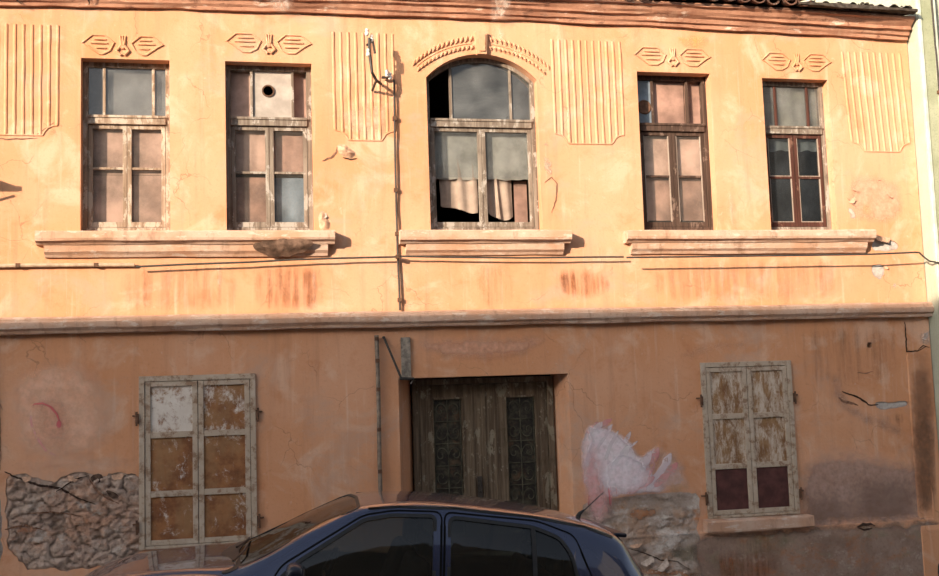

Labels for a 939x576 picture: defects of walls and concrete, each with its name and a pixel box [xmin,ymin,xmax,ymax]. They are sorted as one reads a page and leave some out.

peeling [872,264,889,279]
peeling [872,236,898,251]
crack [904,322,930,352]
spalling [0,472,143,572]
flaking render [581,492,937,576]
damp [807,460,918,522]